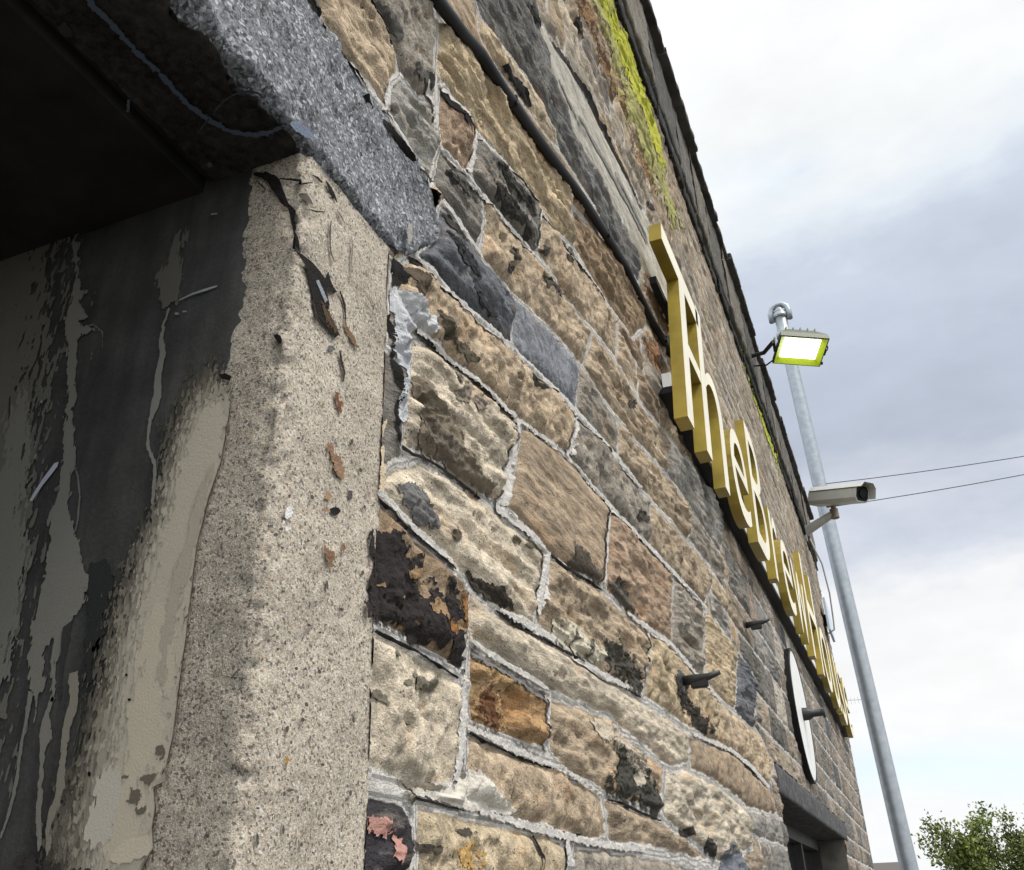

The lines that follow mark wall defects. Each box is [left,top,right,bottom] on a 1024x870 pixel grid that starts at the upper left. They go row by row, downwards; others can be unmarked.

damp [559,78,655,244]
spalling [296,251,338,351]
peeling [109,835,152,865]